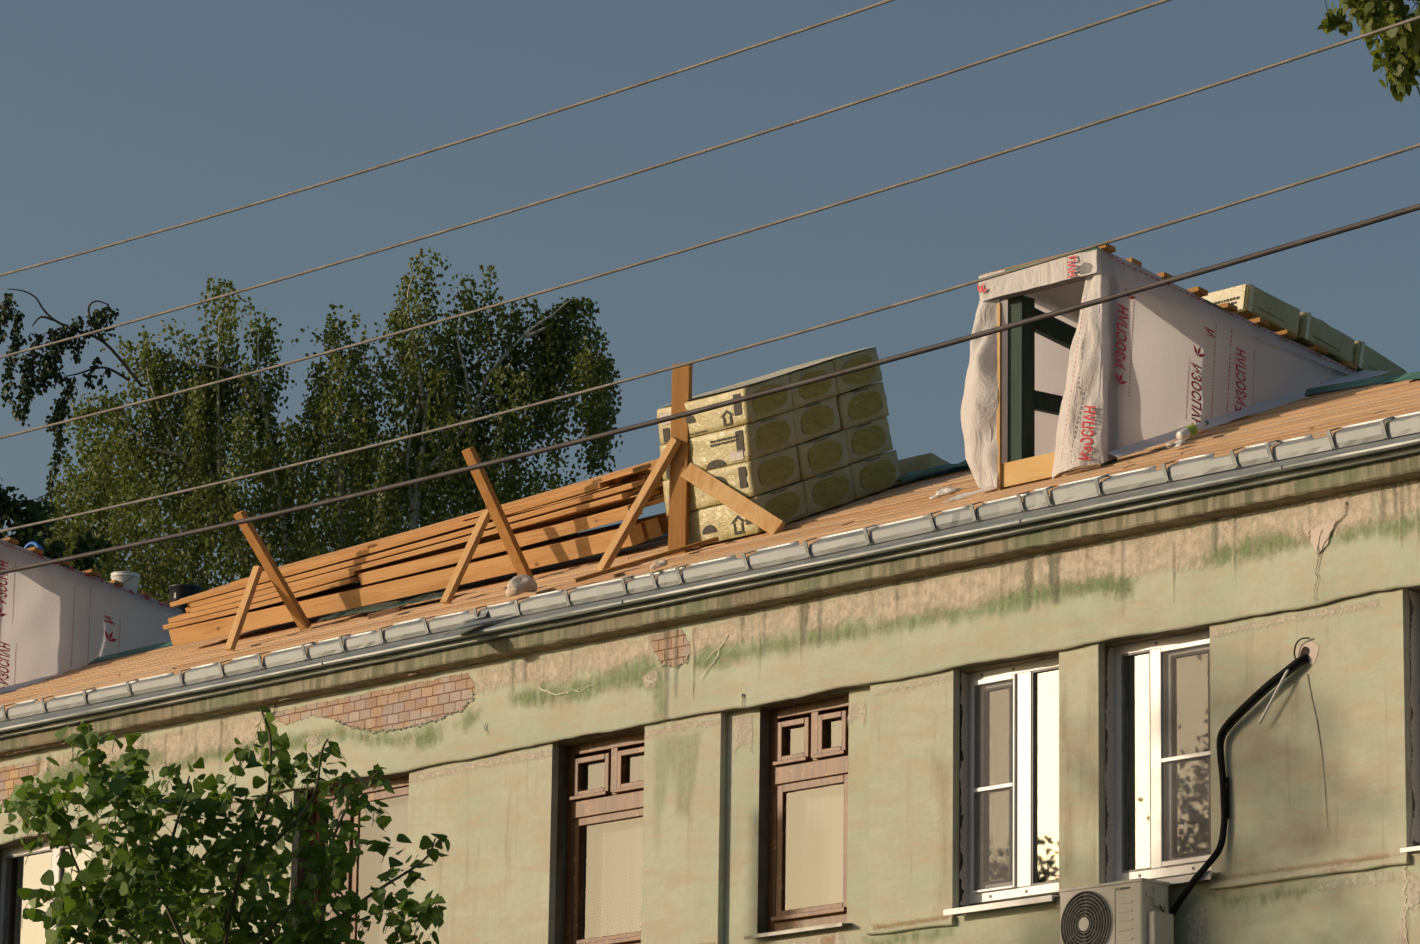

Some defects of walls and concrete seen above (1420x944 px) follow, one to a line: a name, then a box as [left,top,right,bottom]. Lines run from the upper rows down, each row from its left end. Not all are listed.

water stain [1204,519,1295,563]
water stain [885,554,1129,628]
water stain [513,606,866,708]
peeling [0,481,1420,811]
water stain [41,761,90,794]